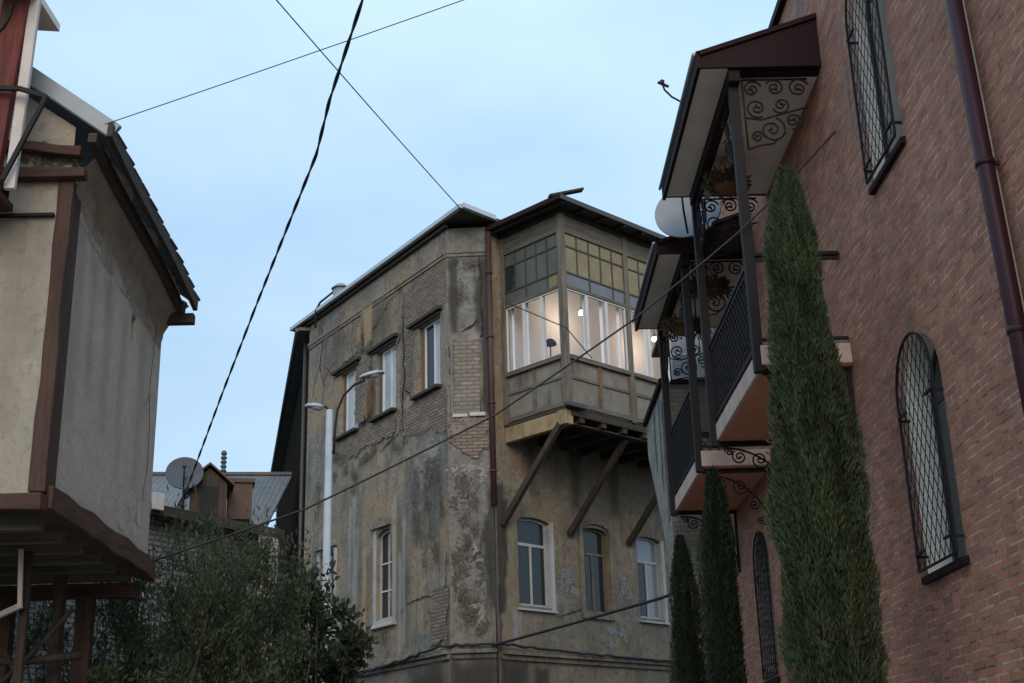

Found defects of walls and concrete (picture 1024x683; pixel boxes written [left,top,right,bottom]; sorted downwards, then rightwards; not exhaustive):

crack [143,335,156,495]
crack [313,290,411,452]
flaking render [314,254,491,639]